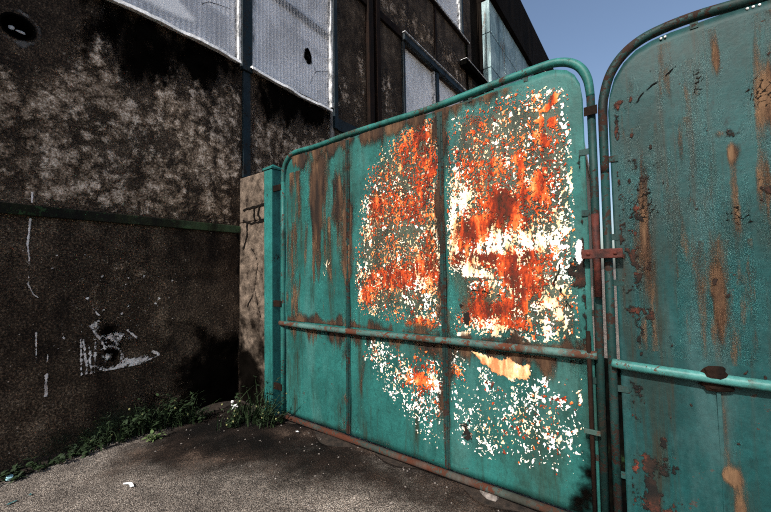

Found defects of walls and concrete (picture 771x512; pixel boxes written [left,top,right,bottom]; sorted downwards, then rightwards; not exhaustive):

leakage [257,81,334,138]
corrosion [614,96,632,140]
corrosion [712,39,720,72]
corrosion [726,129,739,166]
corrosion [754,52,771,128]
corrosion [287,87,587,460]
corrosion [617,158,656,356]
leakage [167,318,265,418]
peeling [365,341,584,472]
corrosion [632,437,683,512]
corrosion [722,466,747,512]